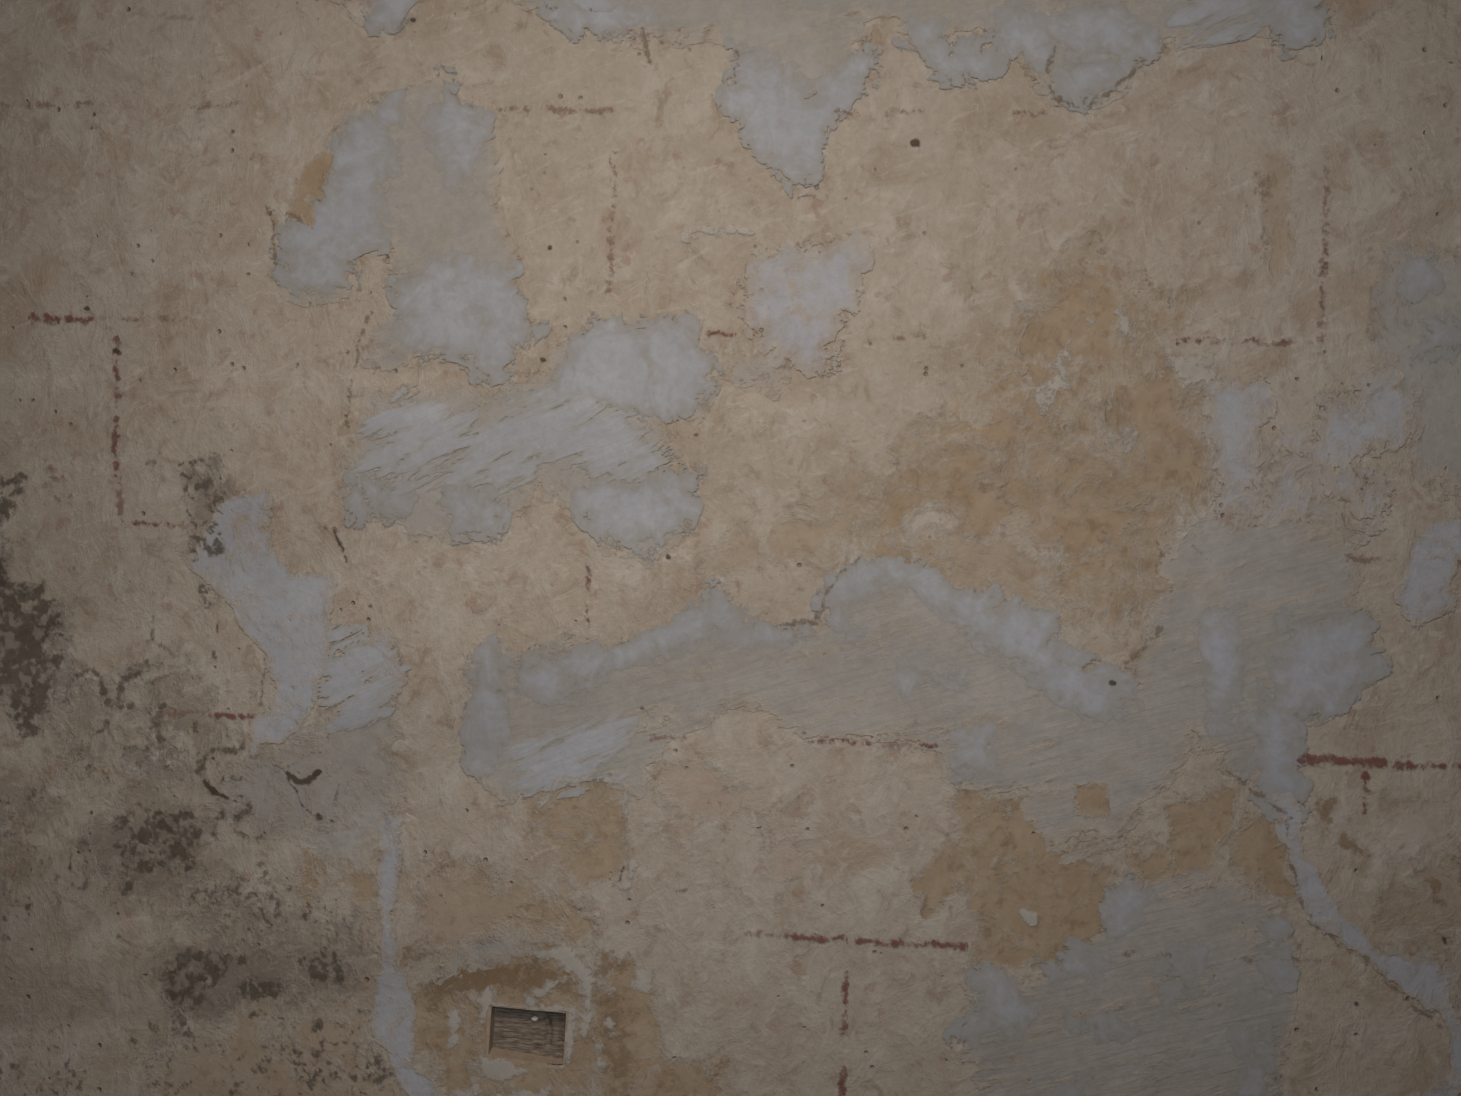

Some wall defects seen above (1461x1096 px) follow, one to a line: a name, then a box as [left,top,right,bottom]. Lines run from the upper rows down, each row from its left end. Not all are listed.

leakage [178,452,240,559]
leakage [0,472,747,1096]